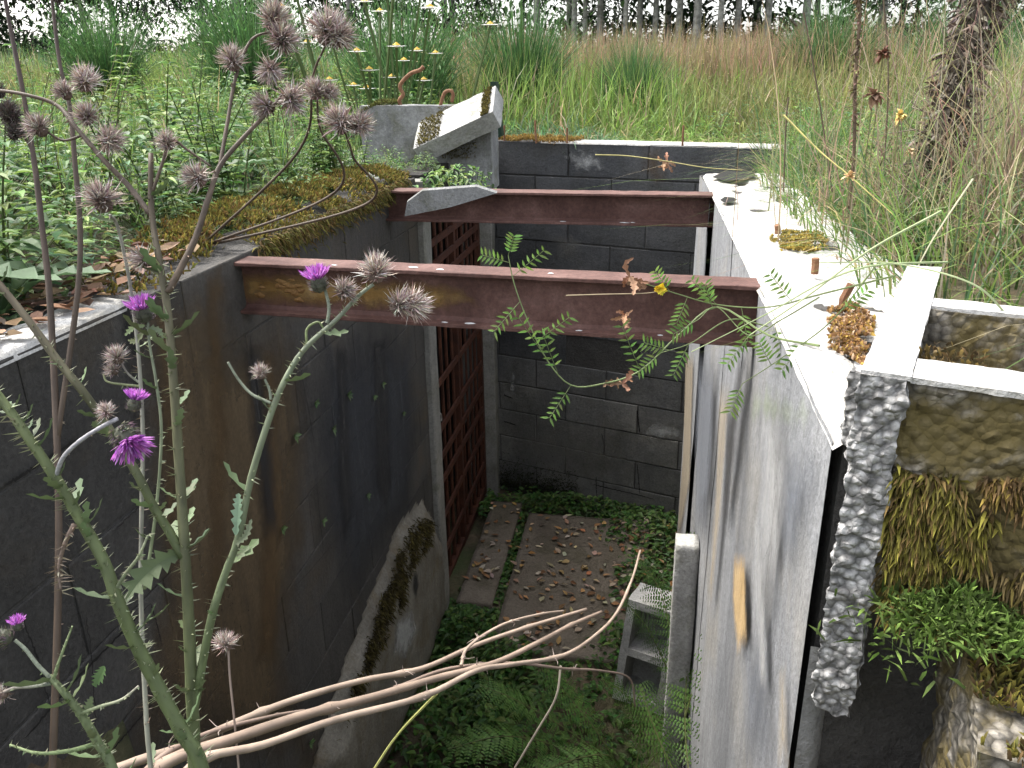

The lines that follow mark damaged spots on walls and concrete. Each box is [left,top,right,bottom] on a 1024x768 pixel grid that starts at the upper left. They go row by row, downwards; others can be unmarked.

corrosion [246,279,461,305]
corrosion [733,561,746,645]
water stain [396,618,415,656]